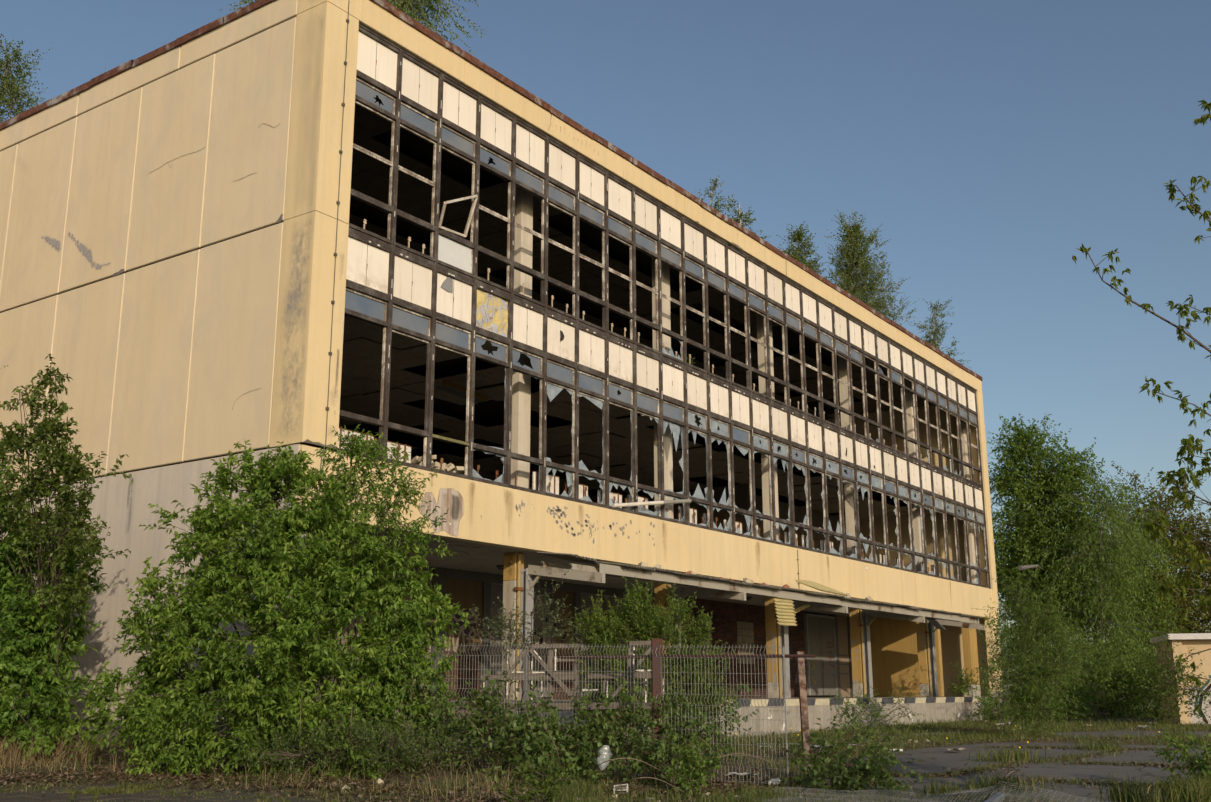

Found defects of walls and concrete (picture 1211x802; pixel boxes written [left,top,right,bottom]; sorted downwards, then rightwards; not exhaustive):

peeling [547,506,655,546]